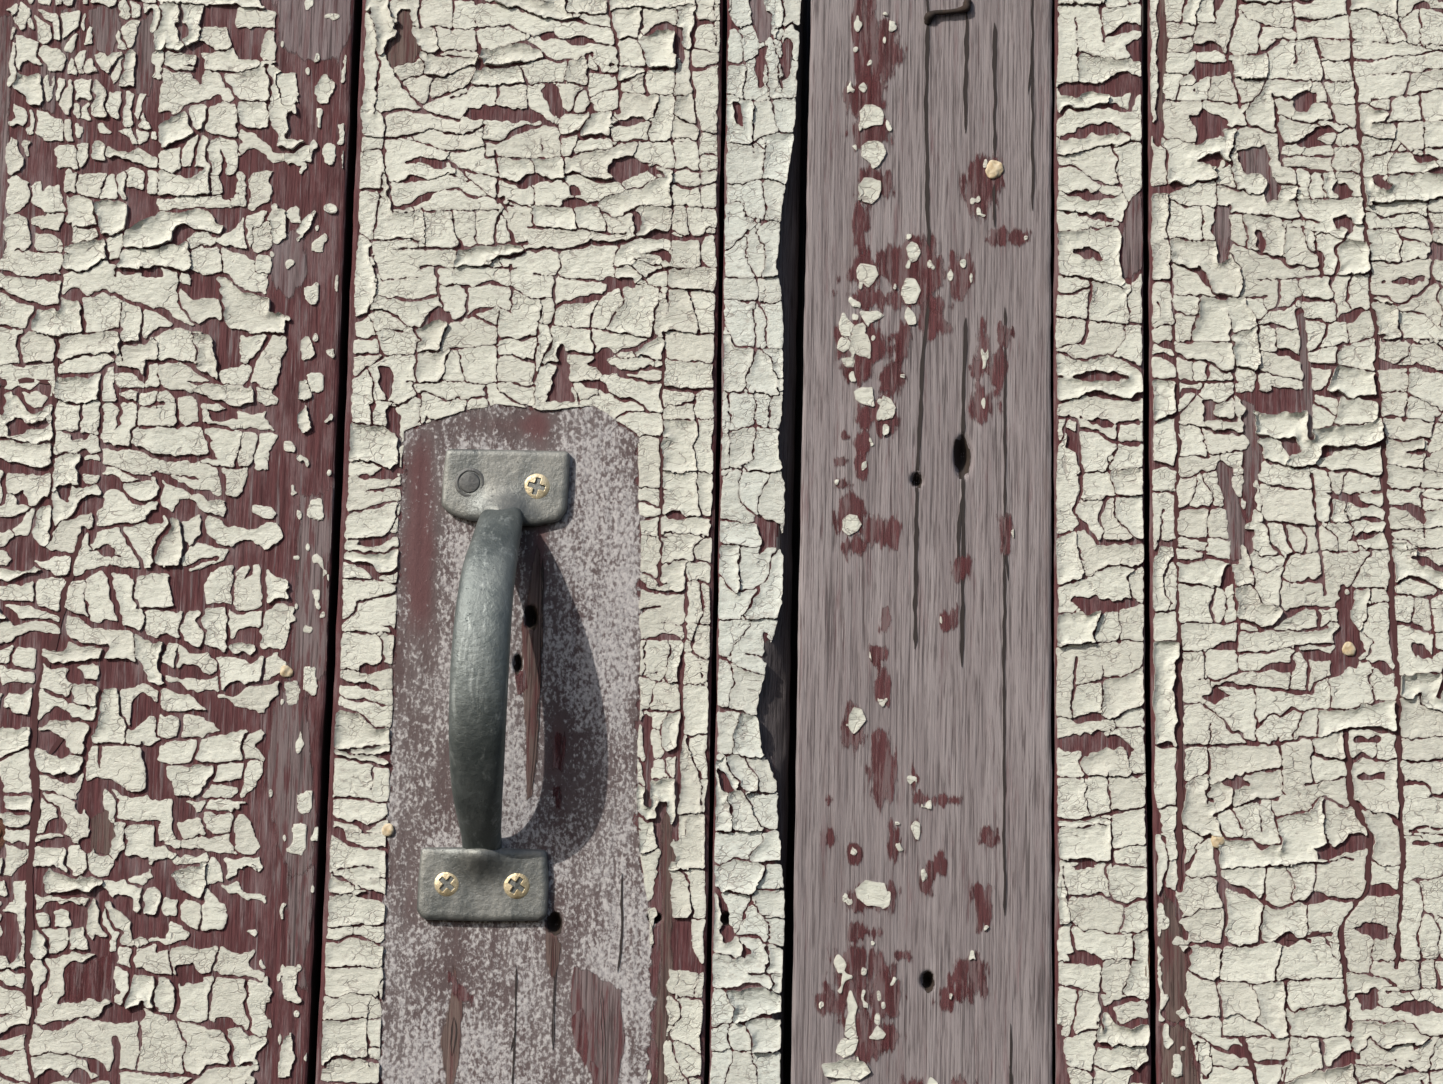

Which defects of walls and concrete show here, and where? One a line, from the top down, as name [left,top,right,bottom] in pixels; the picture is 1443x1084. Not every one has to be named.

crack [0,338,85,1084]
peeling [0,0,801,1084]
crack [413,310,541,404]
crack [619,21,678,305]
crack [637,339,665,580]
peeling [814,700,963,1084]
peeling [832,0,975,563]
peeling [968,316,1015,425]
peeling [959,153,1031,247]
crack [1171,317,1234,889]
peeling [1055,0,1443,1084]
crack [1270,0,1443,1031]